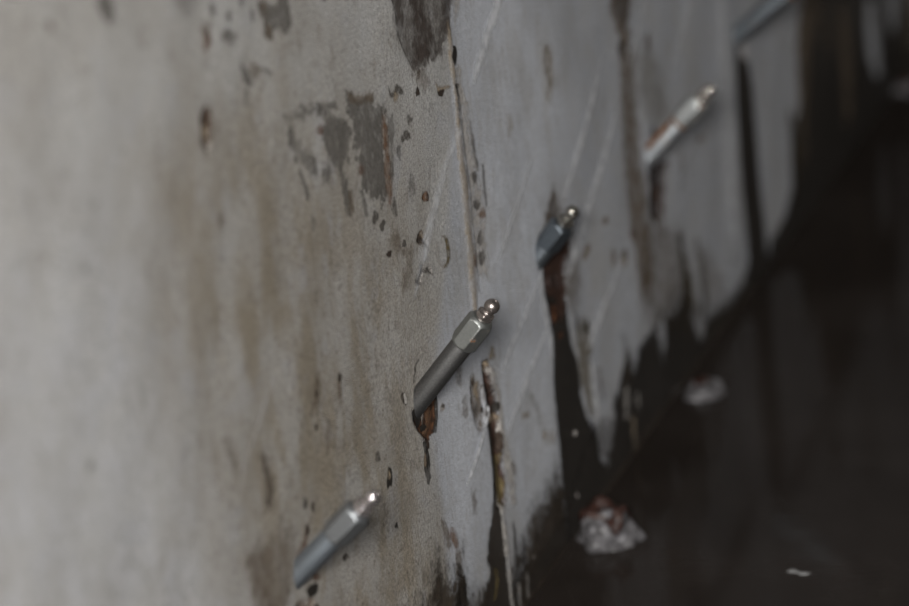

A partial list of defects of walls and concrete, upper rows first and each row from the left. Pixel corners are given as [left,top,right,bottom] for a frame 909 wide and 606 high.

leakage [392,0,450,75]
leakage [288,90,394,216]
leakage [422,0,909,606]